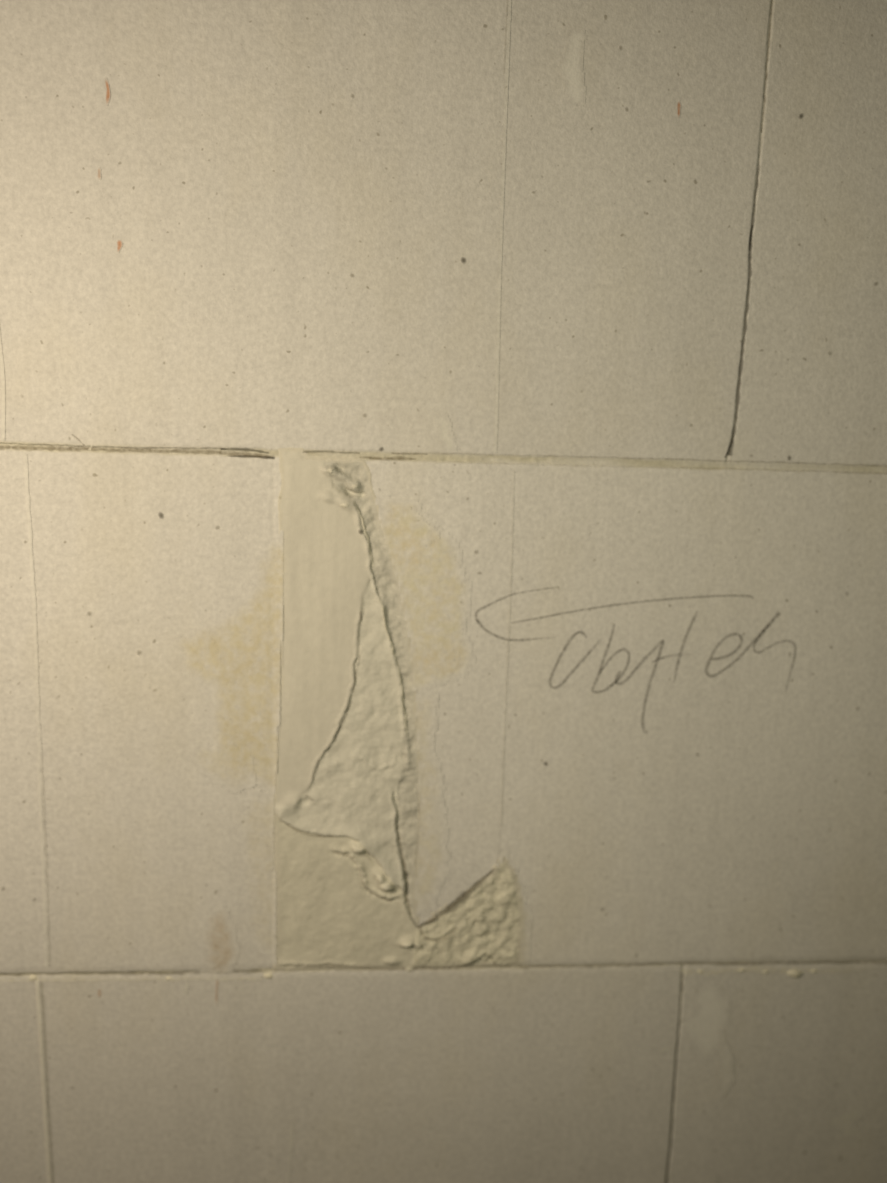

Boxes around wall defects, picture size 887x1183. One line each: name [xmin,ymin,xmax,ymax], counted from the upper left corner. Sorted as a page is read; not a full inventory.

spalling [412,853,523,970]